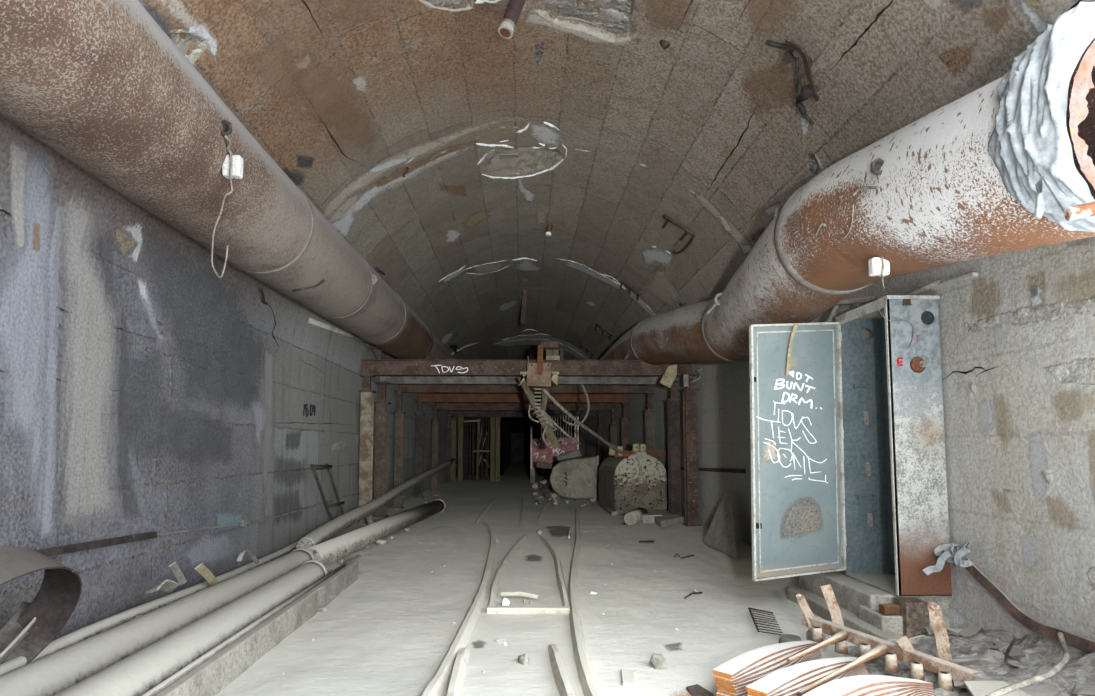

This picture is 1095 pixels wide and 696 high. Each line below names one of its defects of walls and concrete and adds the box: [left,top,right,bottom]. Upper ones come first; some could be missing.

spalling [418,0,474,12]
spalling [535,0,638,44]
crack [831,0,893,70]
spalling [476,143,567,179]
crack [705,106,757,196]
damp [0,142,303,536]
crack [943,367,996,380]